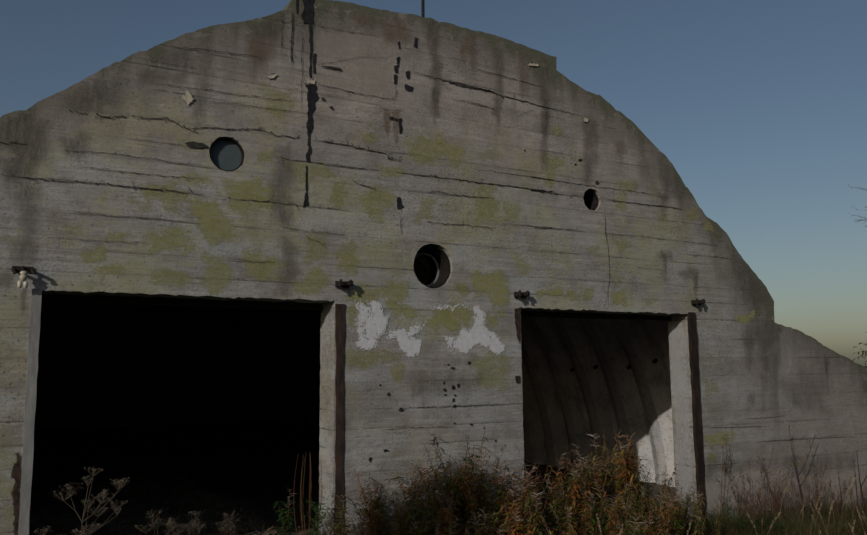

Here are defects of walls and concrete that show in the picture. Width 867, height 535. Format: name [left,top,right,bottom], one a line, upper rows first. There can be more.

crack [1,150,202,243]
crack [69,12,679,307]
peeling [354,300,427,357]
peeling [432,303,505,365]